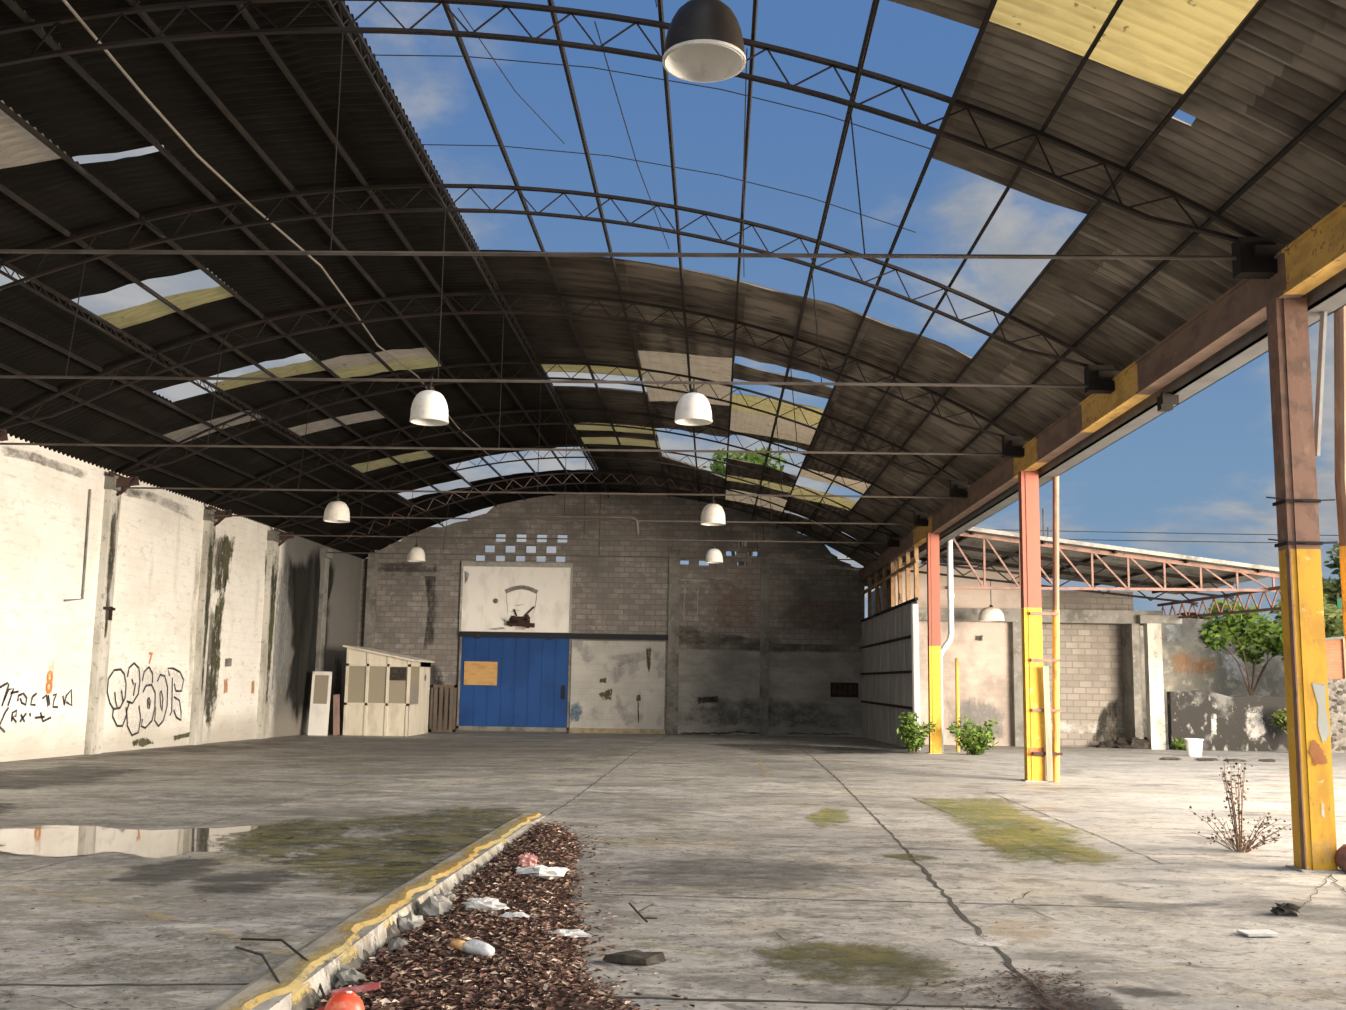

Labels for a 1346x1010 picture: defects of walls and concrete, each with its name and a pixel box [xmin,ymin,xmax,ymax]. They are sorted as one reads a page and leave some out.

damp [201,533,234,729]
damp [265,550,342,719]
crack [885,984,911,1010]